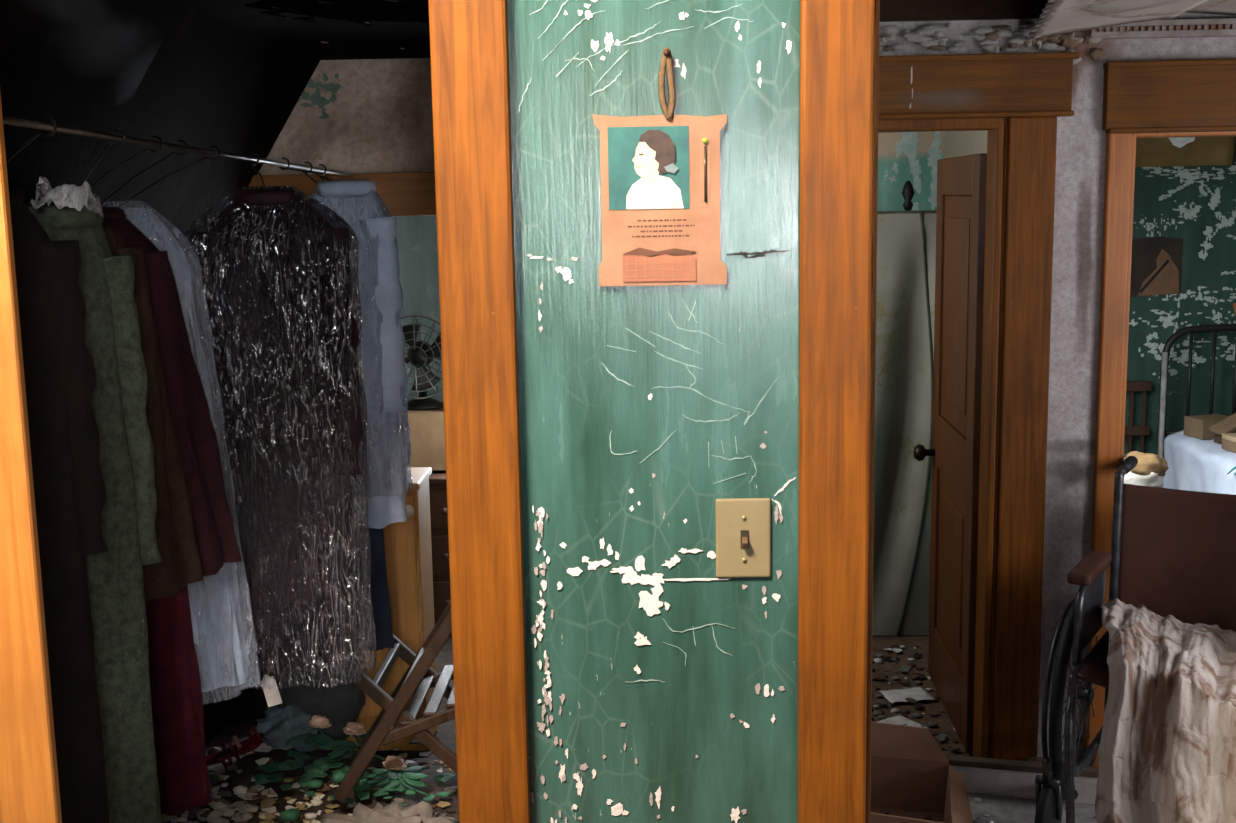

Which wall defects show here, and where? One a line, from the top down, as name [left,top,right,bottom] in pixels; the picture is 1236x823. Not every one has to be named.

peeling [564,0,597,20]
peeling [591,32,620,60]
flaking render [879,0,1106,65]
peeling [1139,162,1236,260]
crack [726,249,791,259]
peeling [1129,270,1236,383]
peeling [531,506,785,823]